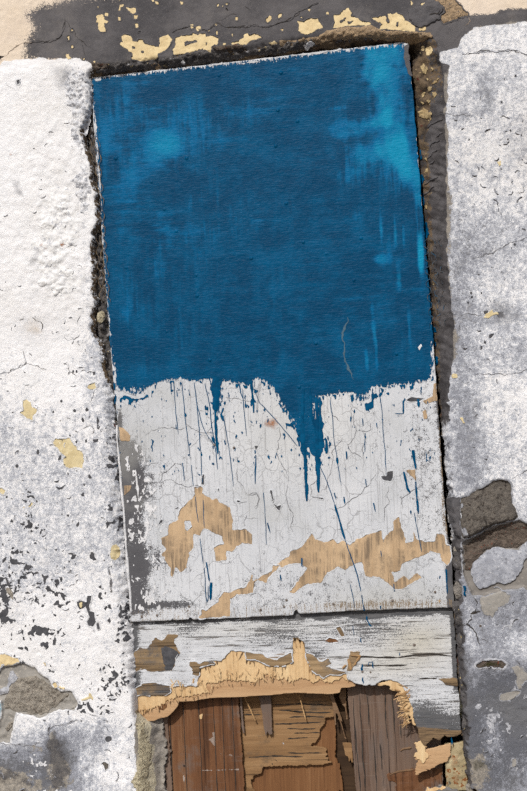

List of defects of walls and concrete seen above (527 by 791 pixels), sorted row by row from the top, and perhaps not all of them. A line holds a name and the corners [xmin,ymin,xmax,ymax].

spalling [81,0,470,121]
peeling [449,188,507,254]
peeling [452,270,517,352]
crack [310,407,419,521]
peeling [155,473,253,578]
flaking render [0,464,181,754]
peeling [188,660,215,677]
peeling [197,516,527,760]
spalling [83,761,128,791]